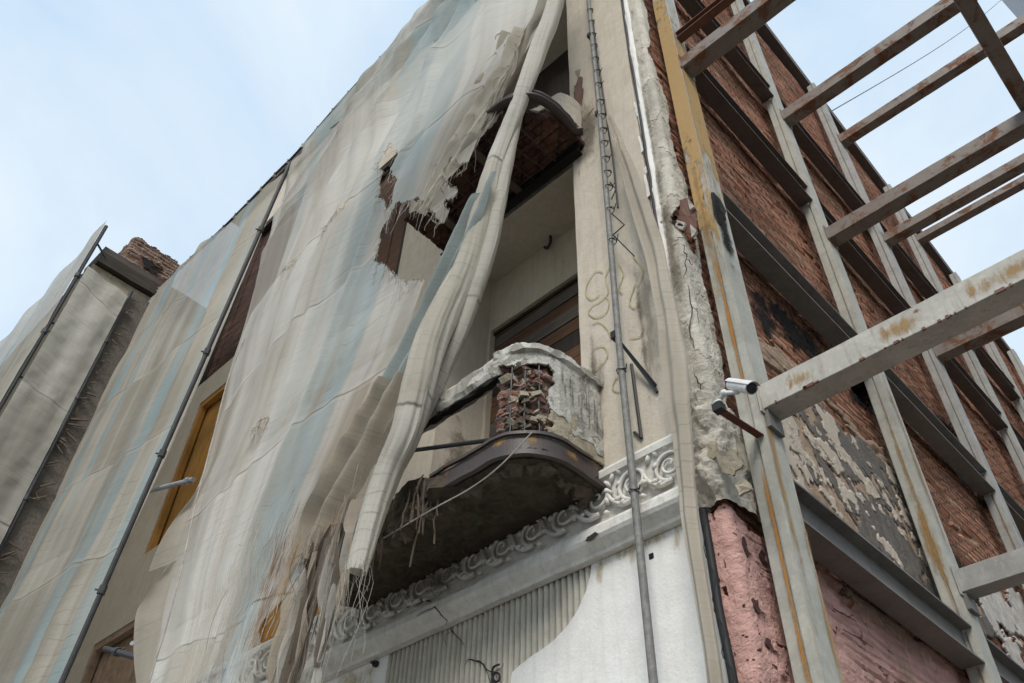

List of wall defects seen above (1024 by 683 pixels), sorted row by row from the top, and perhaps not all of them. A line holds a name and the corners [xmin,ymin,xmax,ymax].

peeling [625,0,699,246]
corrosion [652,0,743,379]
flaking render [498,361,546,431]
crack [683,245,707,390]
peeling [672,254,721,376]
peeling [758,337,797,374]
corrosion [881,319,913,337]
peeling [707,434,753,497]
corrosion [768,428,809,563]
peeling [781,399,941,600]
corrosion [763,475,811,683]
peeling [976,587,1024,668]